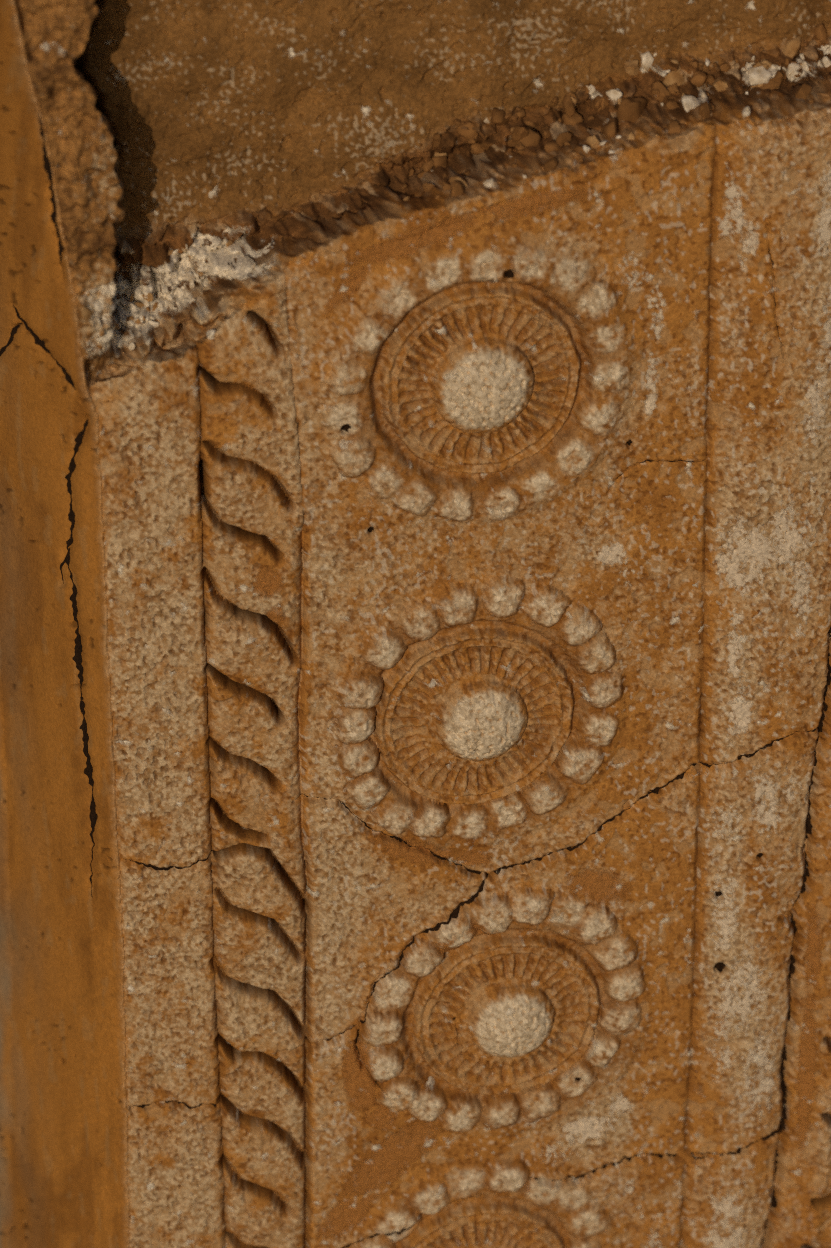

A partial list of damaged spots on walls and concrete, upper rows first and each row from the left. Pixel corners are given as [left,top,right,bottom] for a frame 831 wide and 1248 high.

spalling [741,44,831,99]
crack [38,114,70,278]
spalling [81,227,281,356]
crack [0,305,75,389]
crack [611,459,706,486]
crack [60,419,97,895]
crack [124,856,209,871]
crack [285,627,831,1248]
crack [132,1100,217,1109]